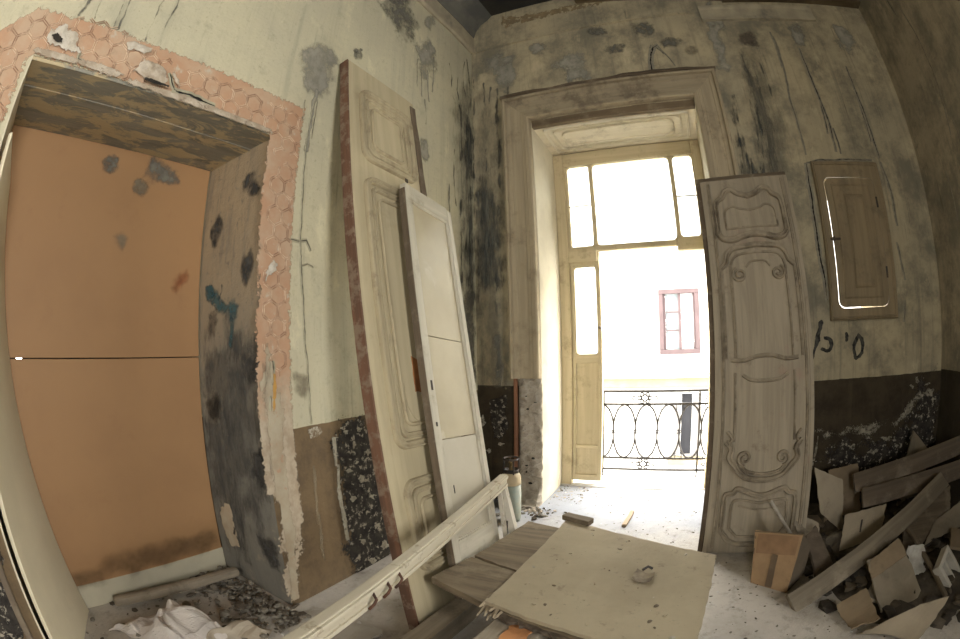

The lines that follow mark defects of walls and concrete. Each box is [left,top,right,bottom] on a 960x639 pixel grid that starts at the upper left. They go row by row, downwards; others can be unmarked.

flaking render [34,23,273,134]
damp [302,45,338,152]
damp [384,0,437,109]
damp [732,32,784,174]
damp [449,54,516,384]
damp [206,285,222,300]
peeling [220,503,240,548]
damp [205,317,265,566]
flaking render [260,344,299,603]
spalling [481,376,543,508]
peeling [0,582,24,639]